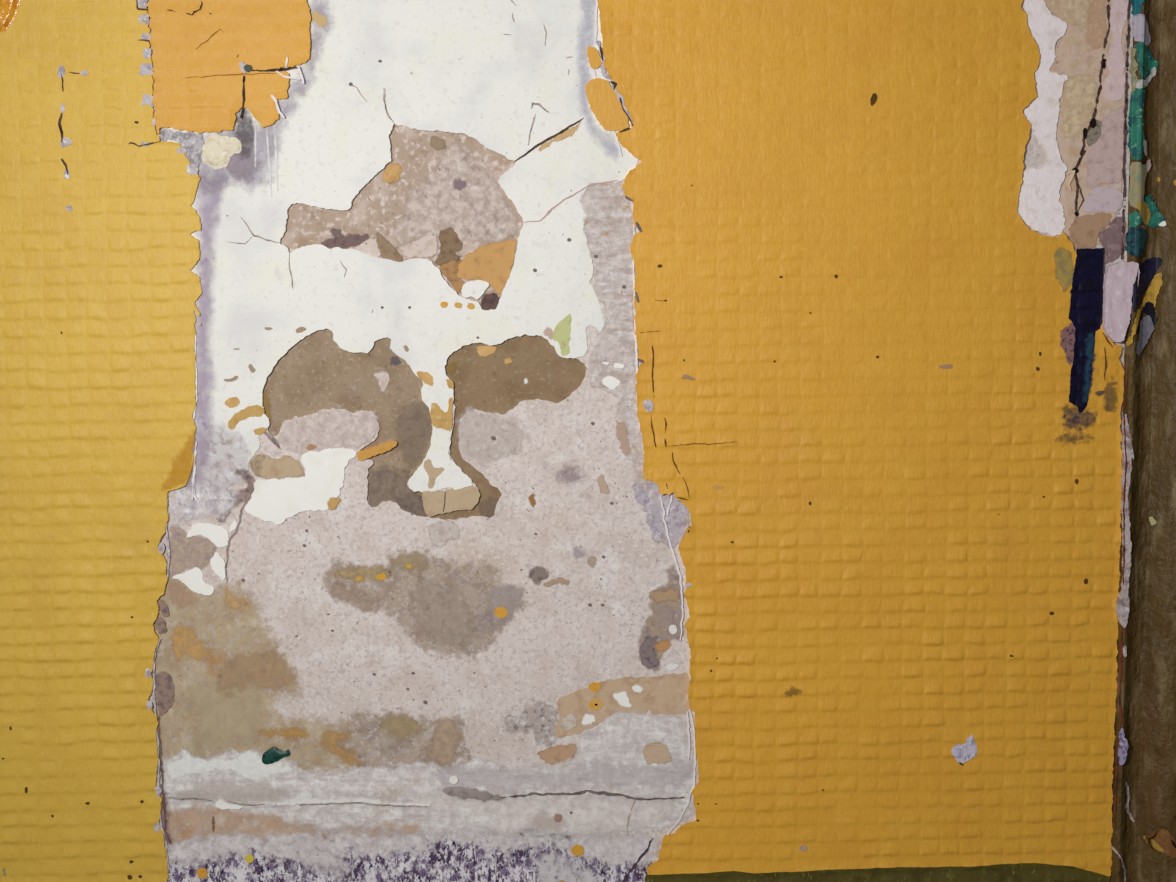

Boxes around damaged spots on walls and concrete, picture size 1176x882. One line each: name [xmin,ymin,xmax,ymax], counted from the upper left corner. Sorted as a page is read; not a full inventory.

crack [514,102,584,162]
flaking render [1017,0,1166,355]
crack [1072,0,1131,259]
peeling [167,0,638,580]
crack [640,331,735,500]
damp [154,575,471,770]
damp [325,551,524,658]
peeling [163,685,699,836]
crack [299,786,684,834]